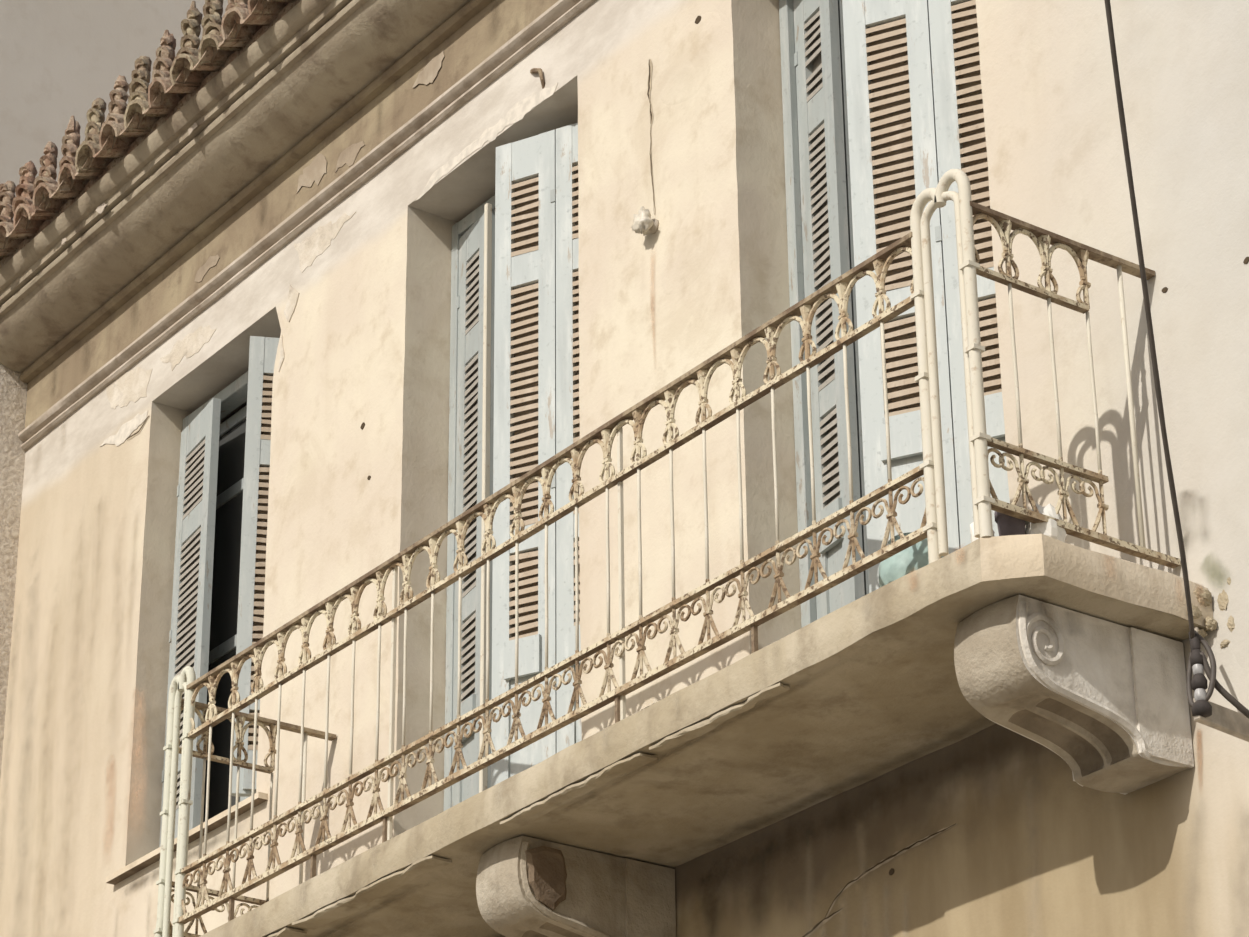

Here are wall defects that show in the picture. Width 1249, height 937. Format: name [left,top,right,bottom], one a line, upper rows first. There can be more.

peeling [412,51,445,88]
peeling [296,141,365,194]
spalling [1187,577,1235,648]
crack [802,823,957,937]